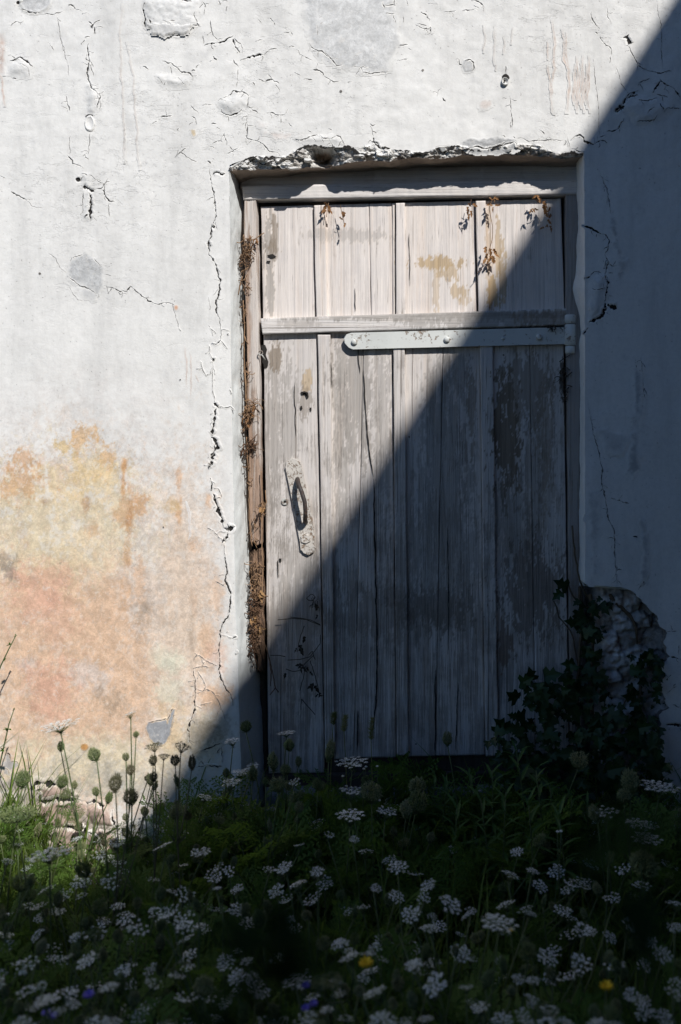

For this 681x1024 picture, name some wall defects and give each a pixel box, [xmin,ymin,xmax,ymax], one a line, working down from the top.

crack [0,175,43,209]
crack [8,3,116,221]
peeling [64,249,107,304]
flaking render [229,134,585,171]
crack [581,175,617,335]
crack [143,0,484,769]
crack [588,407,649,590]
leakage [0,327,240,869]
flaking render [583,584,670,817]